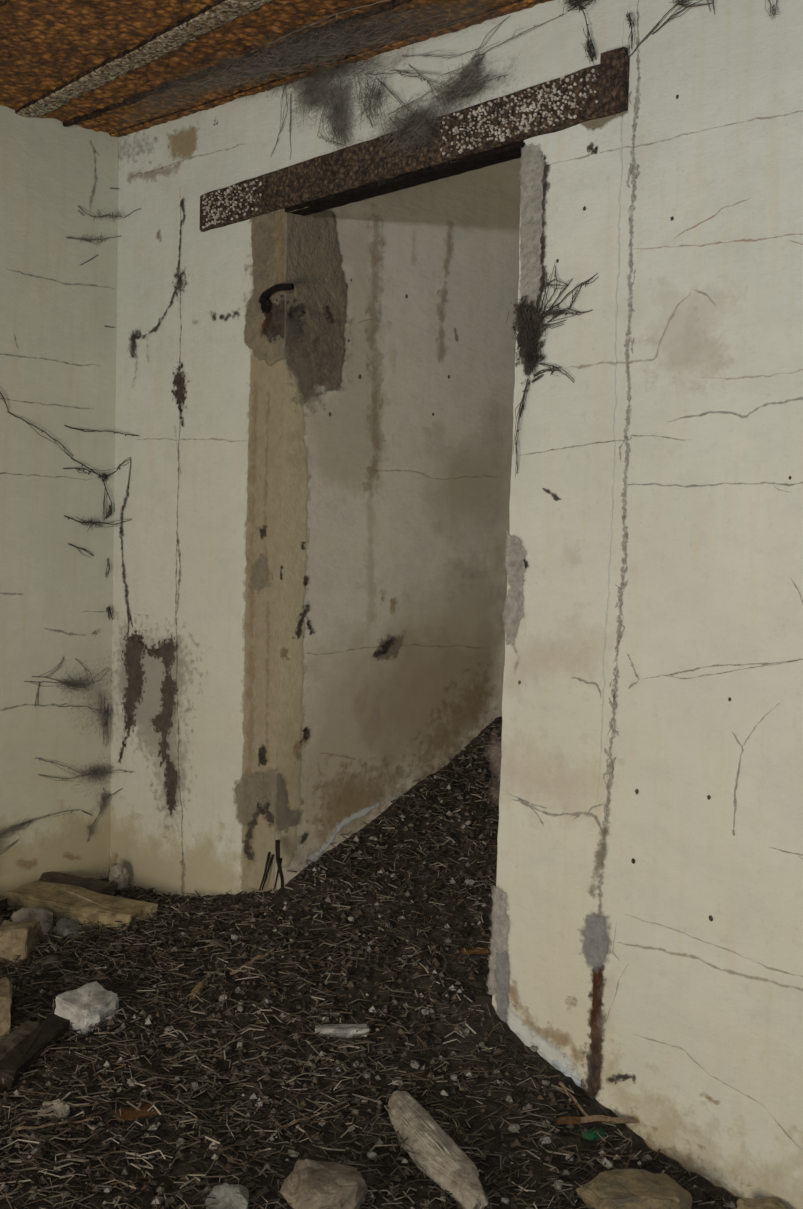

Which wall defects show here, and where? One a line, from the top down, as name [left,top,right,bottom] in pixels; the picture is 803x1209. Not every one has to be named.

crack [119,458,133,632]
crack [519,0,797,916]
leakage [117,630,180,816]
corrosion [589,829,607,895]
corrosion [580,913,610,1100]